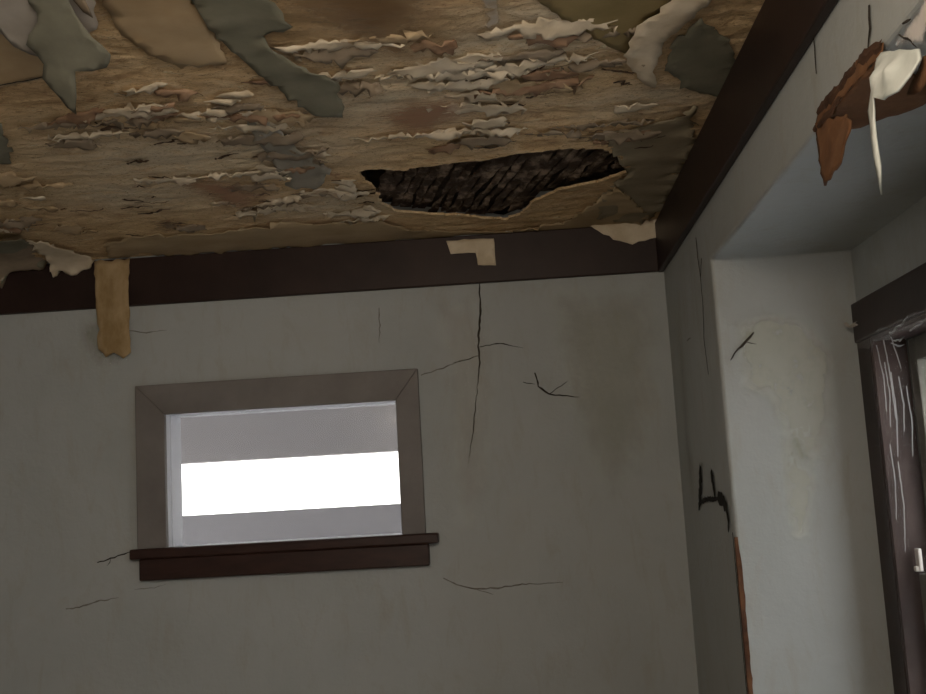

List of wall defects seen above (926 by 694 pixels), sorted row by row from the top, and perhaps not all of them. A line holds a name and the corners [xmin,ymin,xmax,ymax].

damp [291,0,423,53]
peeling [0,0,765,263]
flaking render [812,2,926,195]
crack [421,284,521,463]
crack [523,373,574,397]
crack [443,578,563,595]